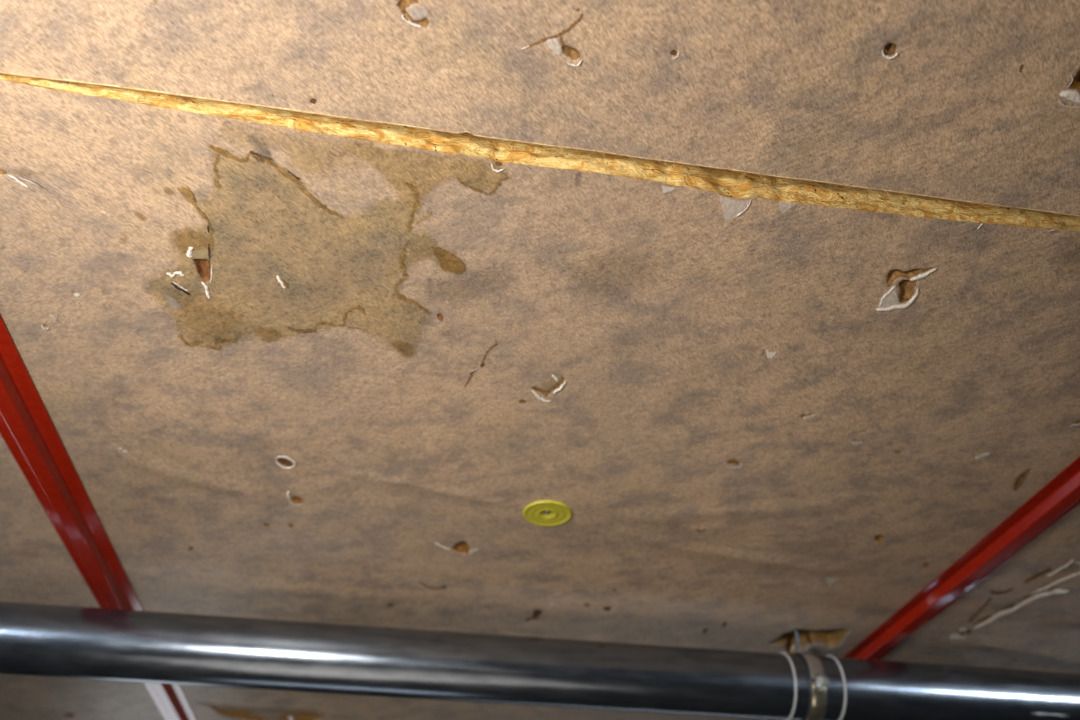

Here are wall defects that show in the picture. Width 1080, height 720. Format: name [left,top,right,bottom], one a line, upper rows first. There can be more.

damp [149,136,508,355]